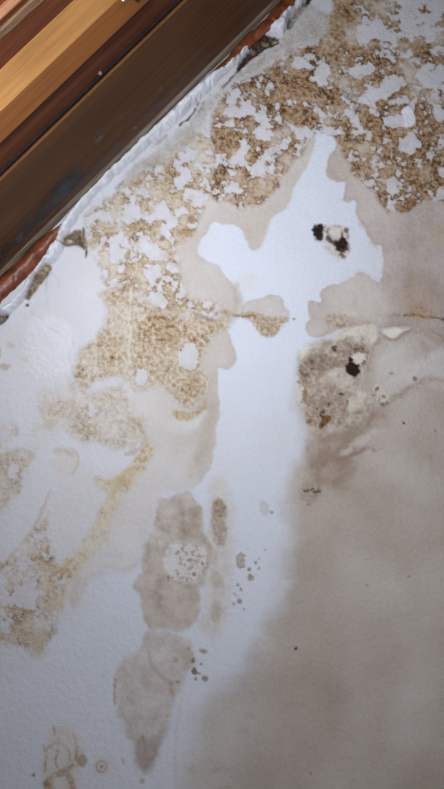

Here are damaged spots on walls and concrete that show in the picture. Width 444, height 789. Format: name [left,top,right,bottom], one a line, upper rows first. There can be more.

flaking render [24,267,51,308]
peeling [0,281,236,663]
peeling [62,0,444,315]
damp [66,137,444,789]
peeling [285,319,416,439]
damp [35,719,89,789]